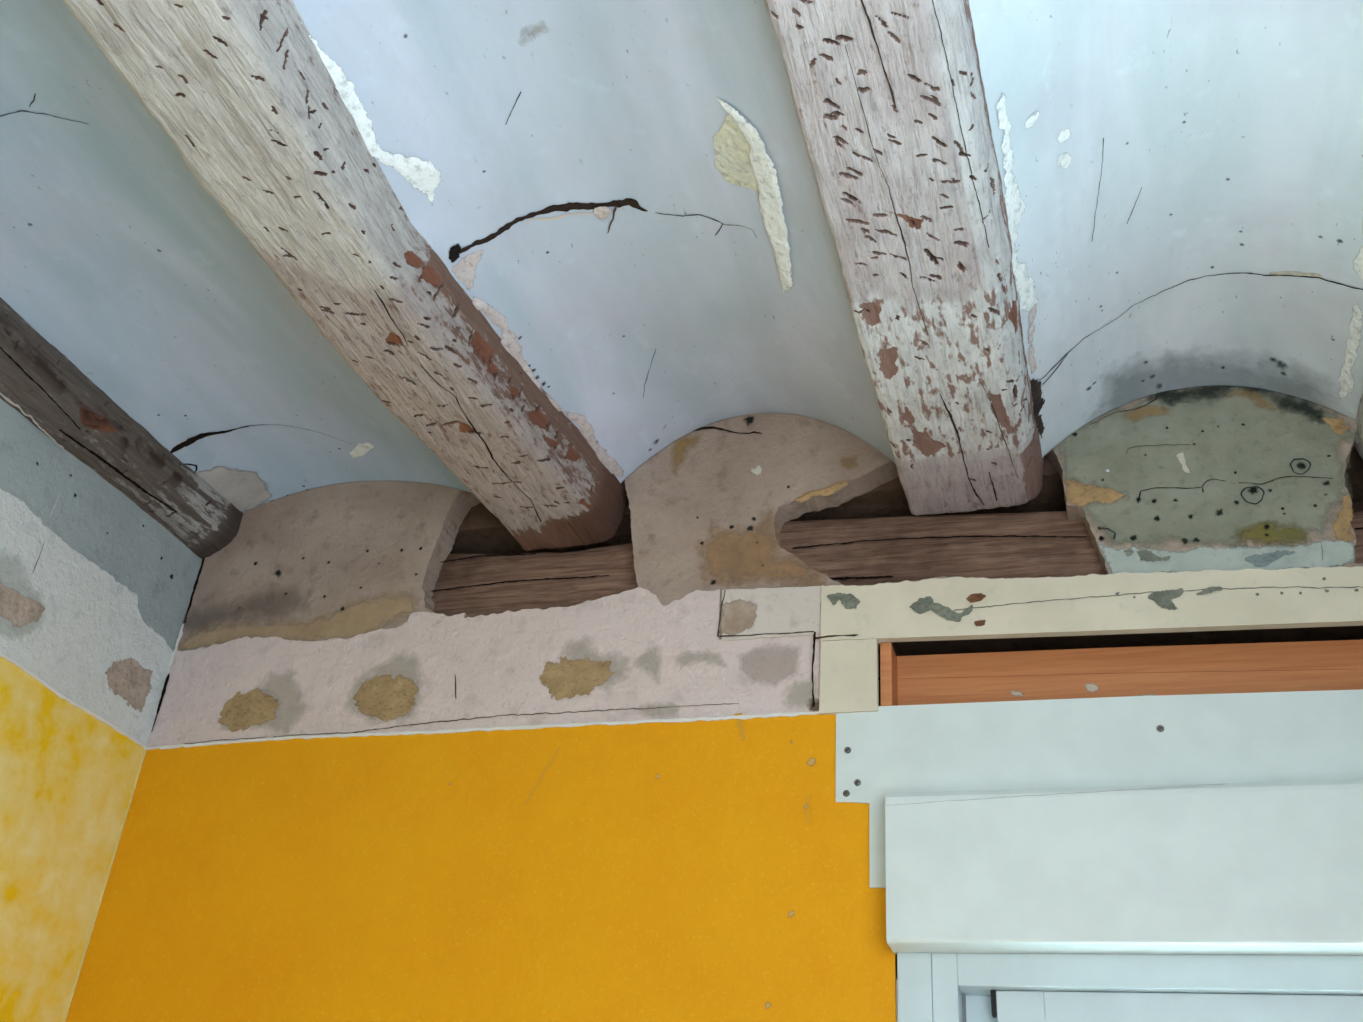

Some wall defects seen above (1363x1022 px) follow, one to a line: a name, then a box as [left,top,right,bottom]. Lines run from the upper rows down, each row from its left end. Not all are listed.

crack [0,94,87,124]
crack [932,0,989,248]
crack [845,0,928,334]
crack [460,198,756,254]
crack [1038,273,1363,385]
crack [170,425,350,473]
peeling [1098,495,1355,610]
peeling [910,593,986,626]
flaking render [105,658,153,712]
flaking render [218,688,279,732]
flaking render [353,674,418,722]
flaking render [539,657,615,700]